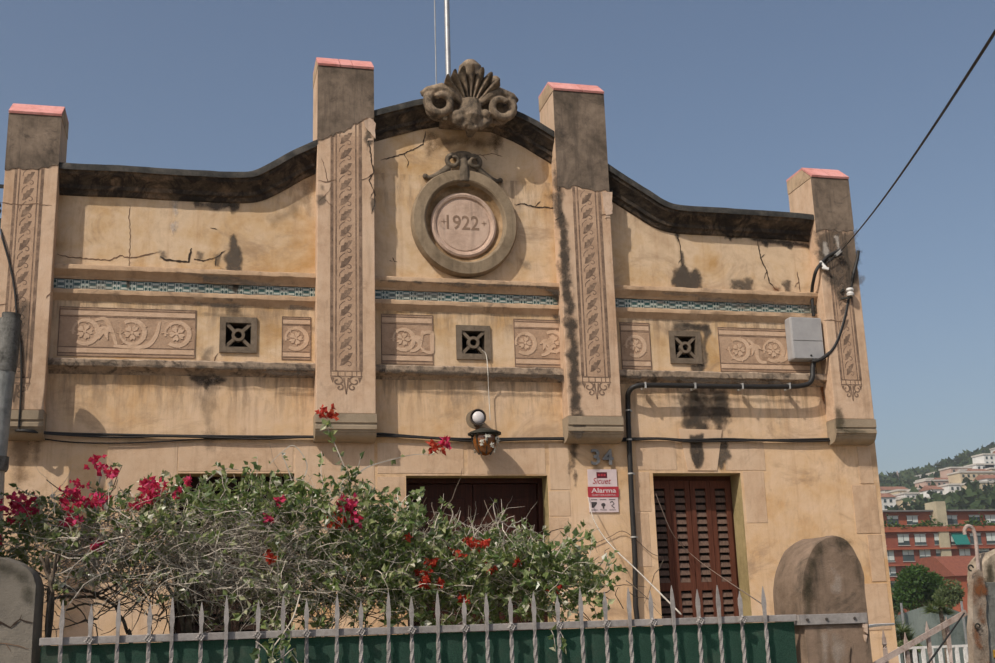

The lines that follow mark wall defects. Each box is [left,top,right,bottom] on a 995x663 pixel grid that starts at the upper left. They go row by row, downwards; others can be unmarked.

crack [362,131,426,203]
crack [58,209,226,266]
damp [190,234,271,308]
damp [665,251,810,309]
crack [757,241,800,292]
damp [379,170,586,477]
damp [622,323,792,469]
crack [0,615,33,652]